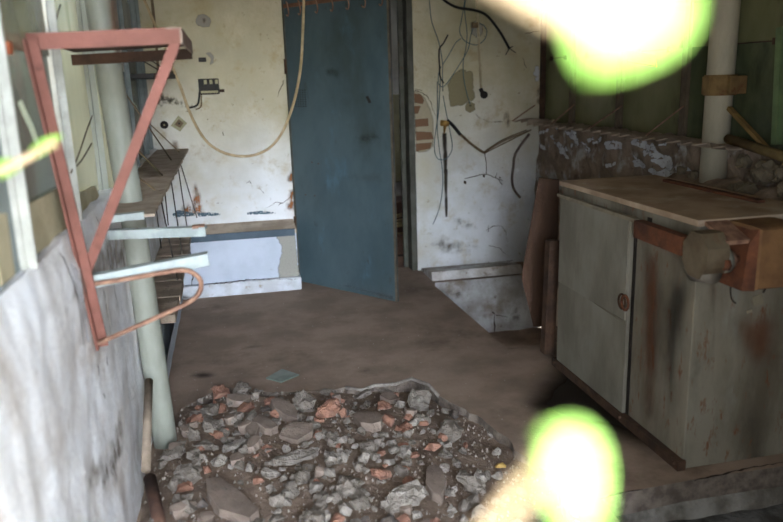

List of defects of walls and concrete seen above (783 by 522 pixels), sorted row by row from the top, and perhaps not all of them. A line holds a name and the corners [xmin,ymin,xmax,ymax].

flaking render [414,91,433,152]
peeling [539,128,691,177]
peeling [277,235,299,278]